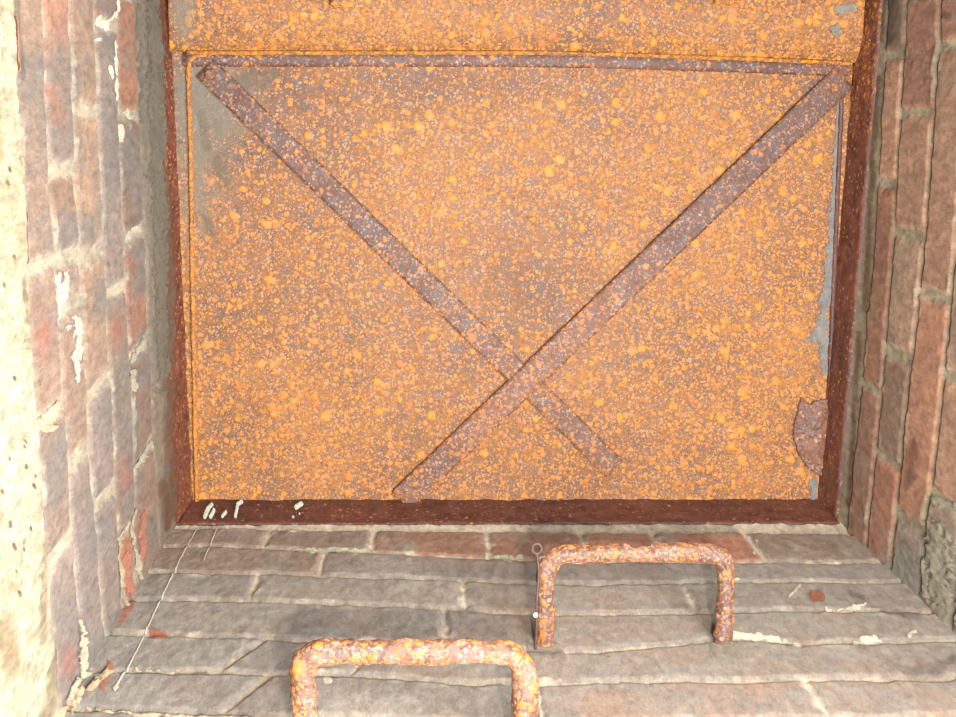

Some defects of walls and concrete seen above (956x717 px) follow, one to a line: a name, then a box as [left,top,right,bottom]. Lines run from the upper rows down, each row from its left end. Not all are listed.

rust [793,398,829,475]